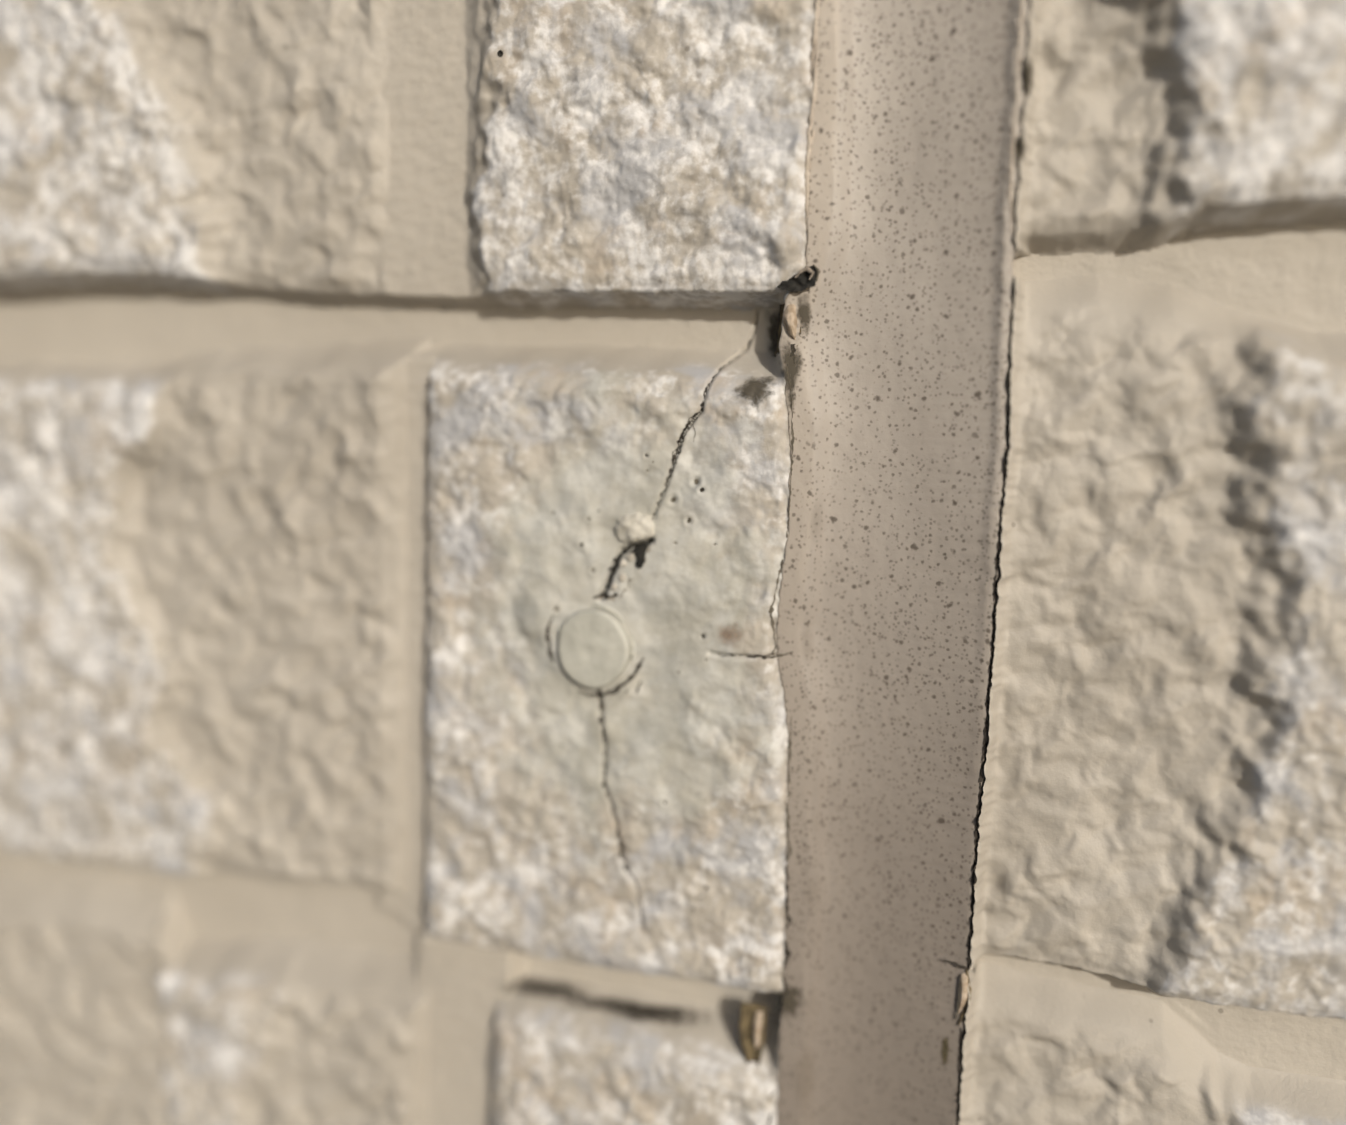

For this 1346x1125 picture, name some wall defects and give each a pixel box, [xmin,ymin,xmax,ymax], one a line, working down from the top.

crack [651,315,758,520]
crack [717,360,795,659]
crack [966,309,1014,968]
crack [954,1028,962,1125]